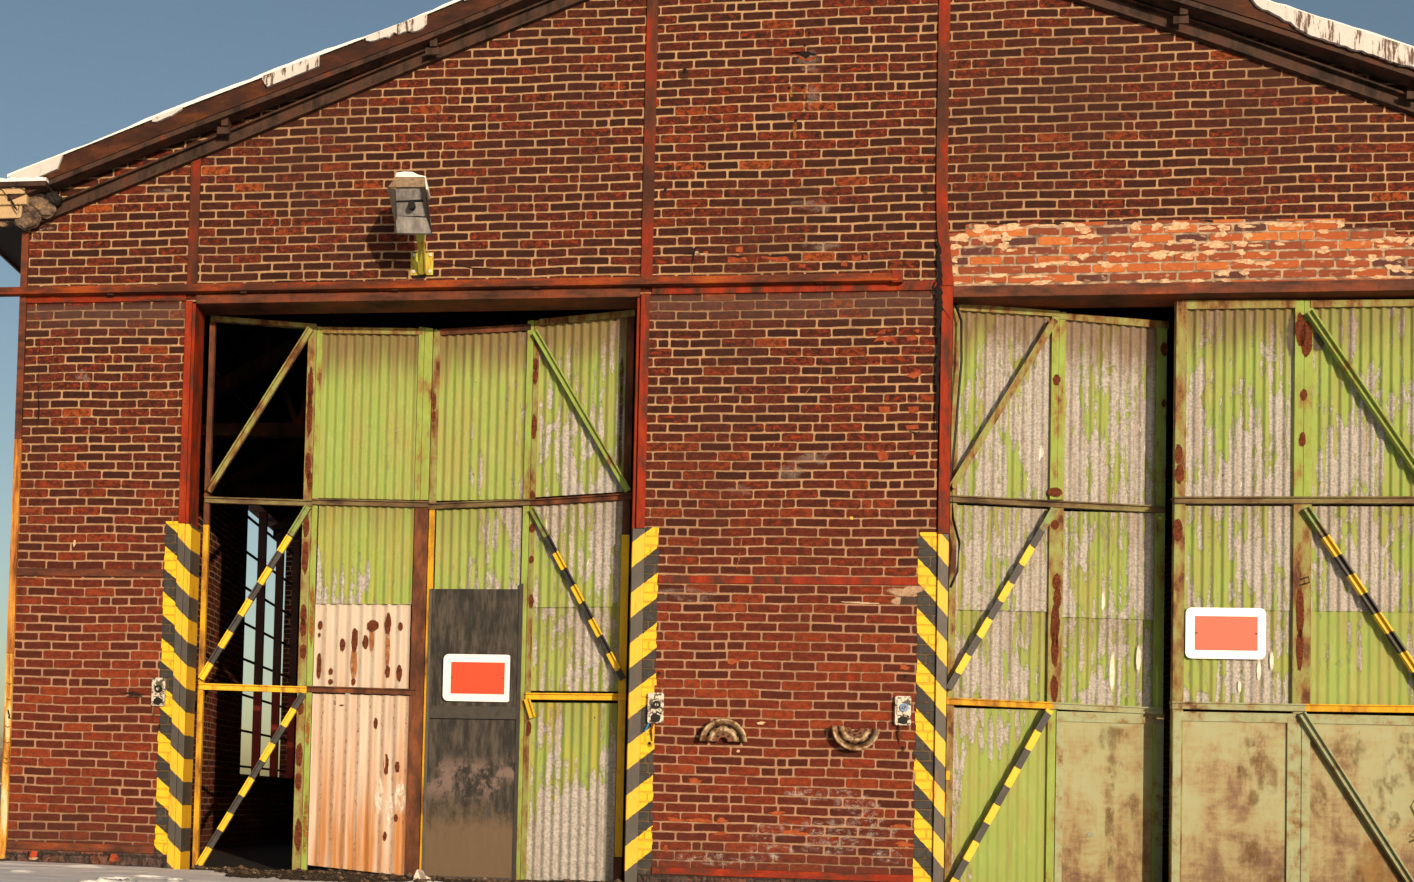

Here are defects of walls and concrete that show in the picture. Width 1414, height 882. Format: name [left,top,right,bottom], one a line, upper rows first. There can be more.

peeling [950,219,1414,285]
rust [1295,312,1313,357]
peeling [1238,652,1274,692]
rust [383,754,400,775]